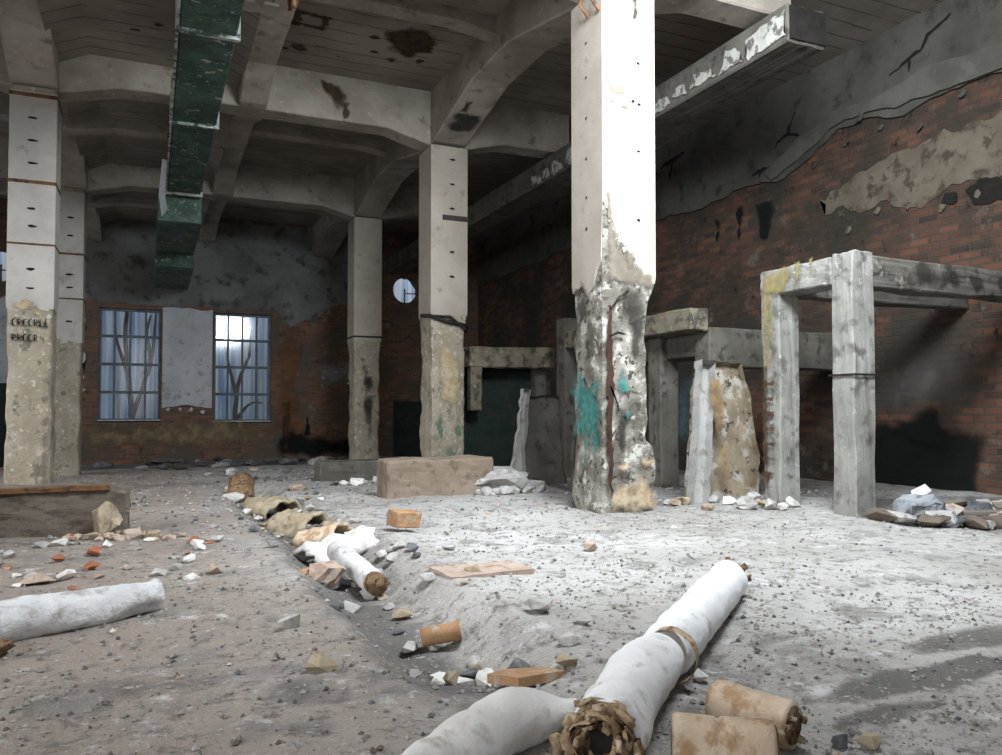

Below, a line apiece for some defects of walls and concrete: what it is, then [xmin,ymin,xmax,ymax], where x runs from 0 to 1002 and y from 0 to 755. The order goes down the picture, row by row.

crack [889,13,951,76]
leakage [322,80,349,118]
leakage [450,102,479,131]
peeling [419,0,1002,324]
spalling [438,331,459,419]
leakage [892,409,945,449]
spalling [613,479,656,510]